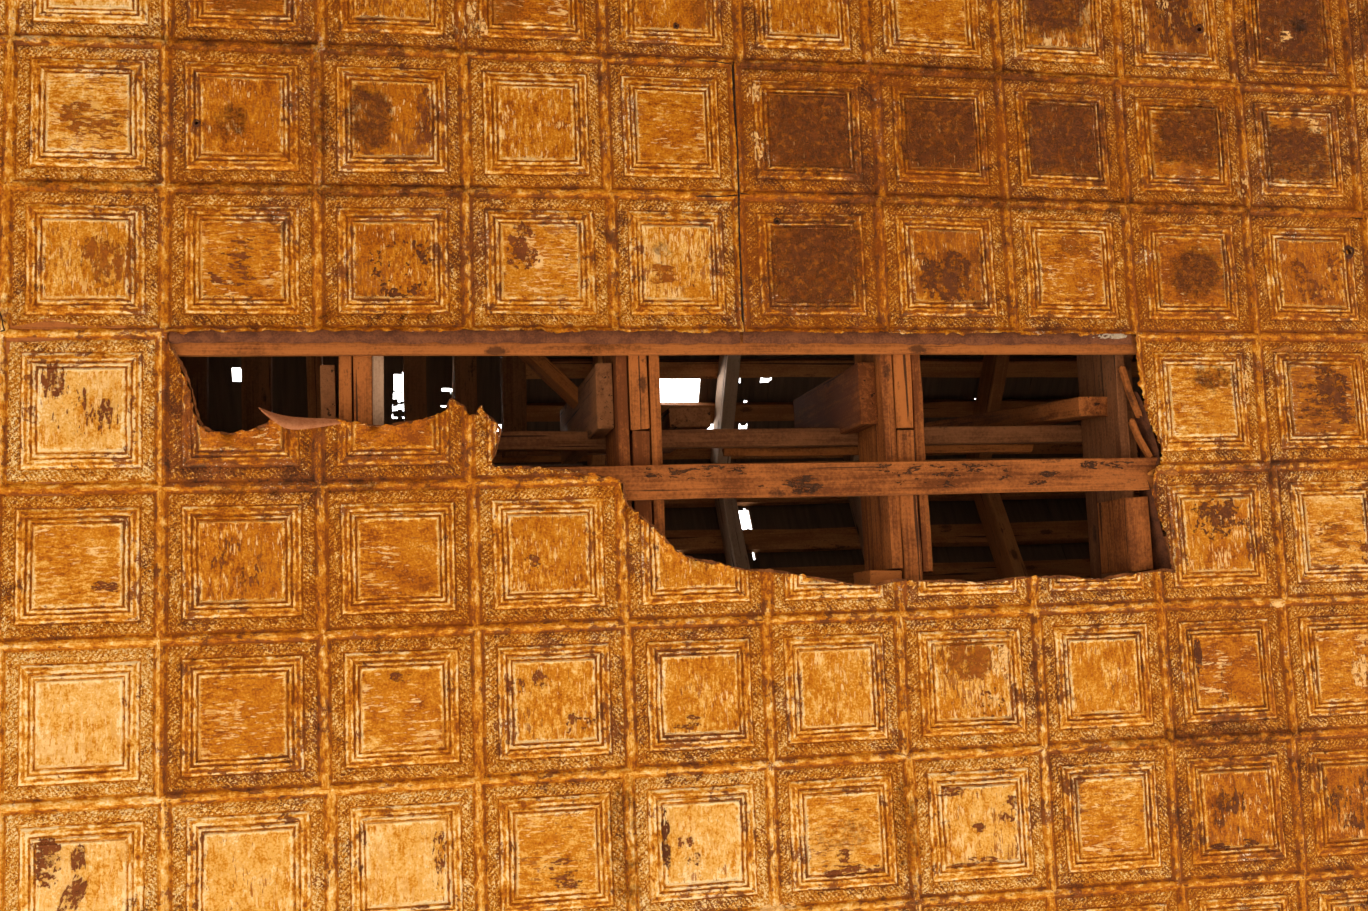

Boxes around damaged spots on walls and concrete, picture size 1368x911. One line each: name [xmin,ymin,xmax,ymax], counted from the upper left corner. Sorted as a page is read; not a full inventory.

rust [346,84,393,150]
rust [732,61,858,176]
rust [848,61,1089,211]
rust [1154,100,1227,168]
rust [1078,199,1256,215]
rust [762,218,865,311]
rust [1172,247,1223,298]
peeling [897,470,964,487]
peeling [983,461,1134,486]
peeling [211,537,262,587]
peeling [518,553,541,571]